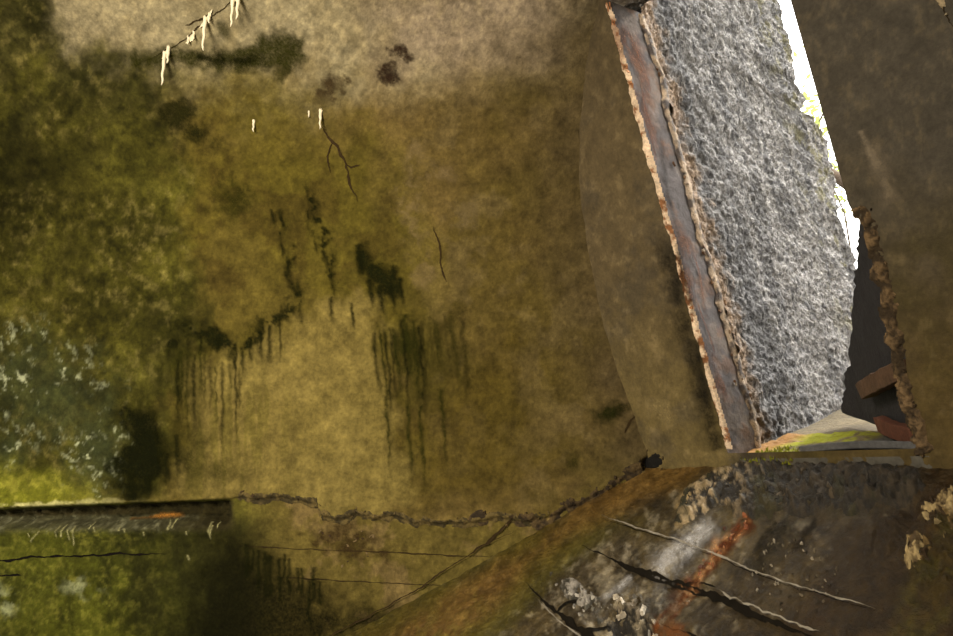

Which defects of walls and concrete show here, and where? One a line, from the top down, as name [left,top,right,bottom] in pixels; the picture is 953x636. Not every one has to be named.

water stain [130,0,305,85]
water stain [378,45,412,84]
peeling [606,2,732,449]
water stain [166,211,301,414]
water stain [356,244,403,309]
spalling [638,14,953,569]
water stain [106,406,179,500]
crack [0,552,161,576]
crack [526,582,615,636]
crack [582,545,818,636]
corrosion [673,512,751,617]
crack [605,516,873,609]